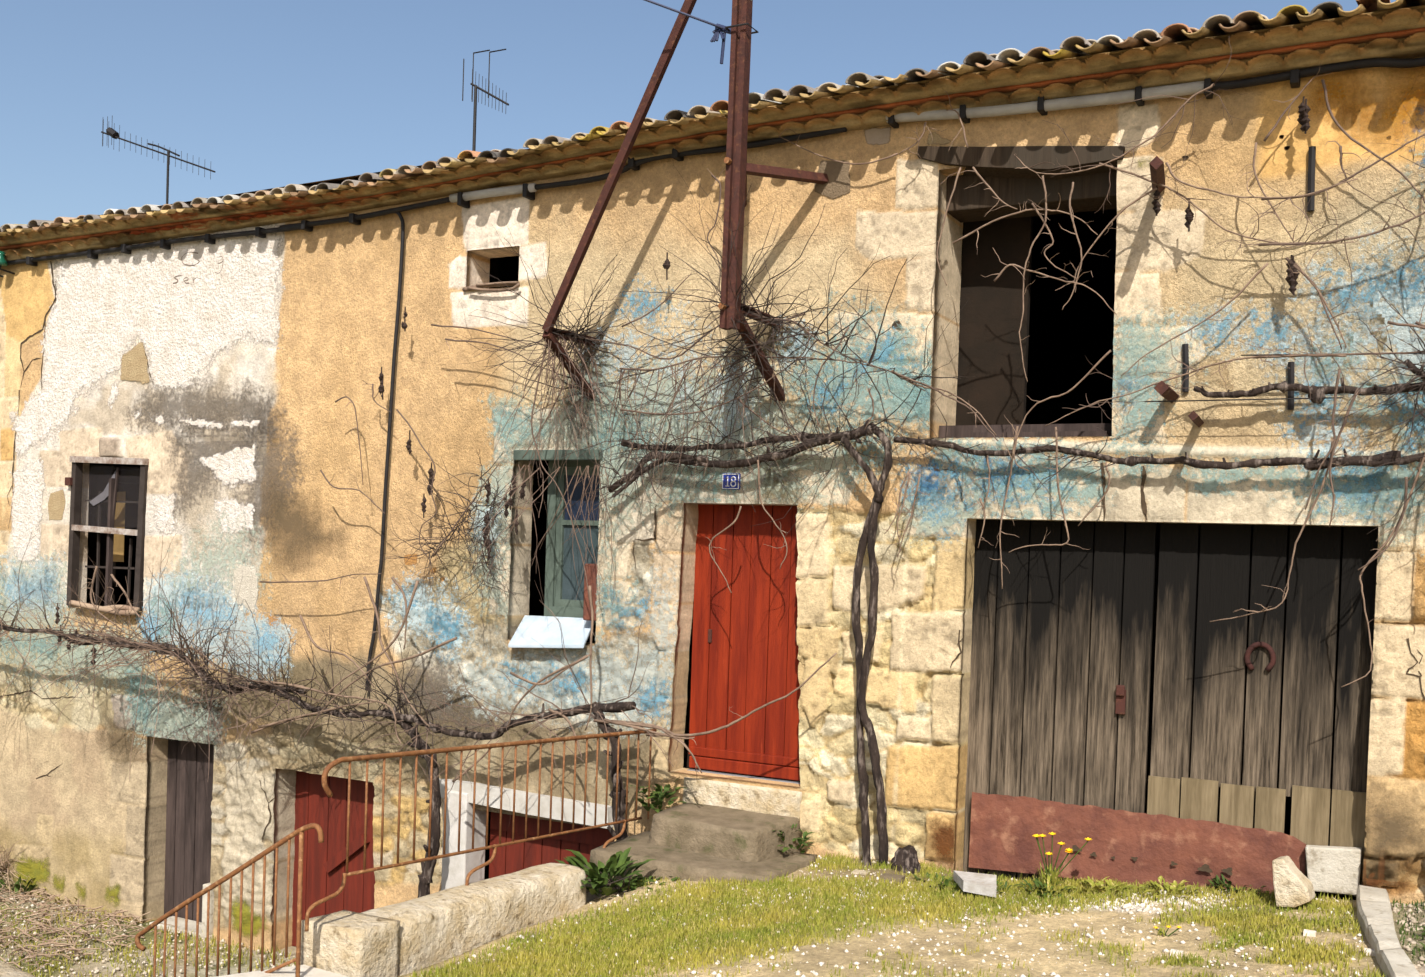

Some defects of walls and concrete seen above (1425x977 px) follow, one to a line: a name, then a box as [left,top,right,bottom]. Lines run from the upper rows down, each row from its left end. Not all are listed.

peeling [9,209,297,567]
water stain [0,381,332,765]
peeling [232,557,279,631]
spalling [404,554,445,582]